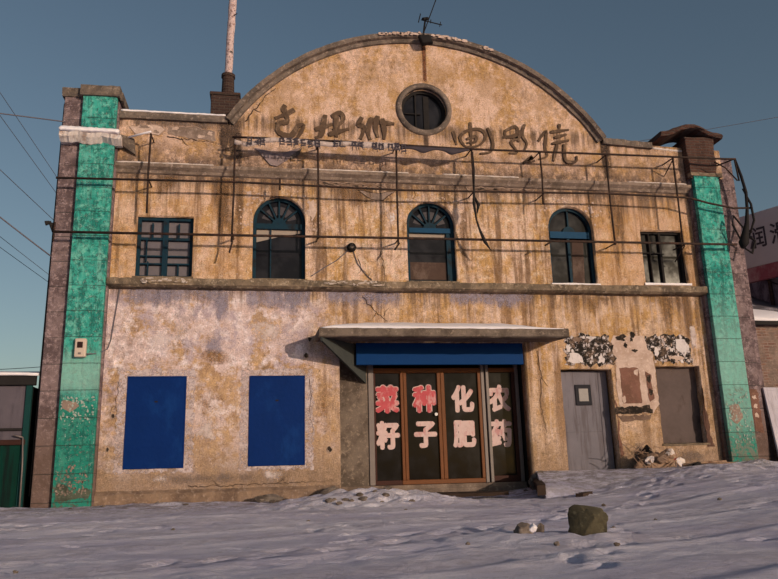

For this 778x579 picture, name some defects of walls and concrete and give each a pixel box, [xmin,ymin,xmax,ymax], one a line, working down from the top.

flaking render [129,124,216,142]
leakage [216,179,243,247]
peeling [60,396,95,423]
peeling [563,331,694,457]
peeling [54,465,90,502]
crack [188,477,336,487]